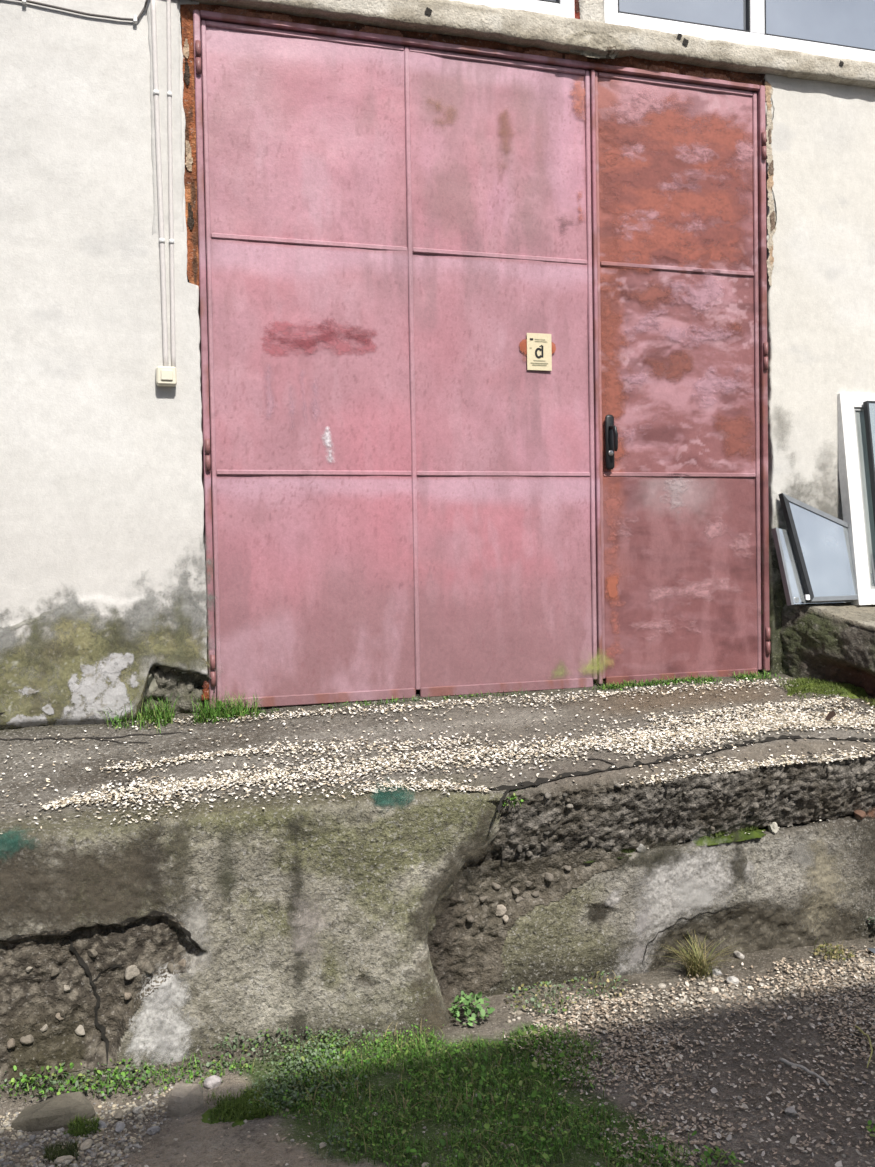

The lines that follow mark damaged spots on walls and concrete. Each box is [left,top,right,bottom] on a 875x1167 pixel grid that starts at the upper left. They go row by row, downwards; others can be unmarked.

damp [0,558,211,668]
peeling [6,653,215,728]
crack [487,735,875,813]
spalling [0,911,203,1083]